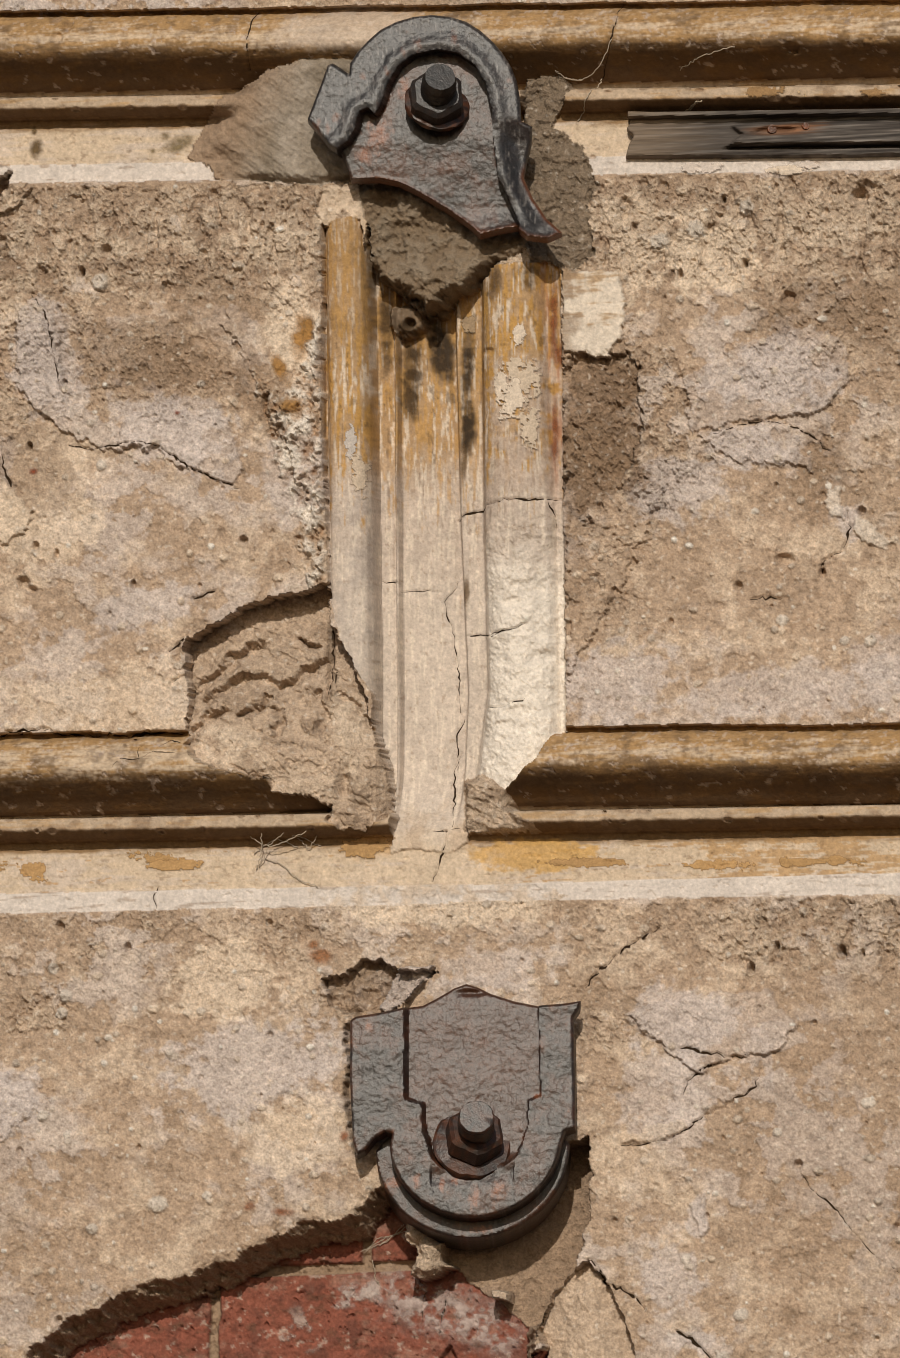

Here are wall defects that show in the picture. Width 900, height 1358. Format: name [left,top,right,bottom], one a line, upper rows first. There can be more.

flaking render [522,76,641,526]
crack [705,421,827,450]
crack [460,498,557,526]
crack [821,512,852,573]
flaking render [185,585,397,859]
crack [388,582,527,880]
peeling [0,861,48,883]
peeling [127,850,204,871]
flaking render [324,961,435,1016]
crack [621,1046,757,1146]
flaking render [28,1145,594,1358]